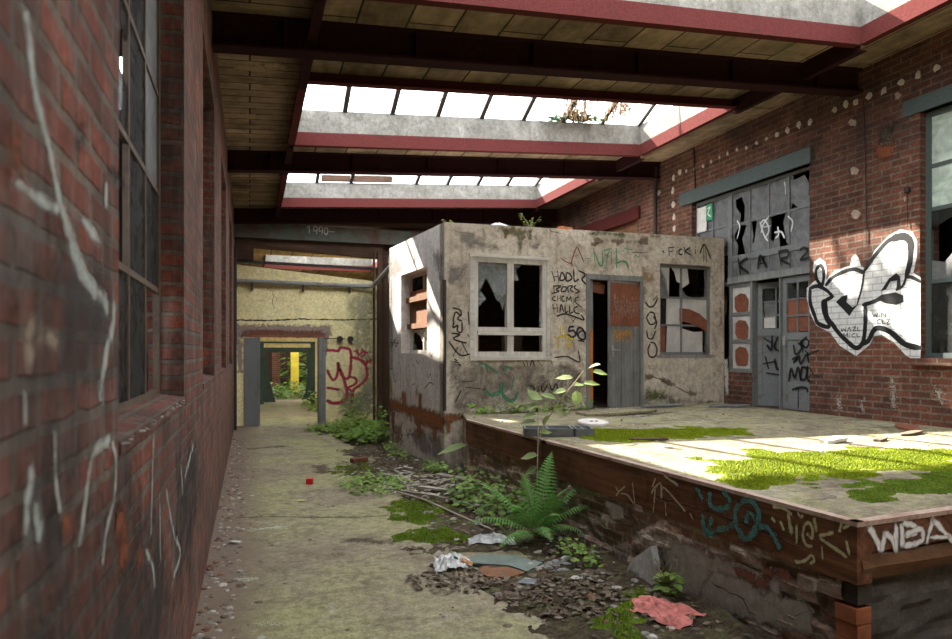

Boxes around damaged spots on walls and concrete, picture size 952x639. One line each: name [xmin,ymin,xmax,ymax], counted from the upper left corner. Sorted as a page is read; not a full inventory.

leakage [463,233,496,248]
leakage [502,227,539,250]
leakage [434,252,467,282]
crack [622,372,696,417]